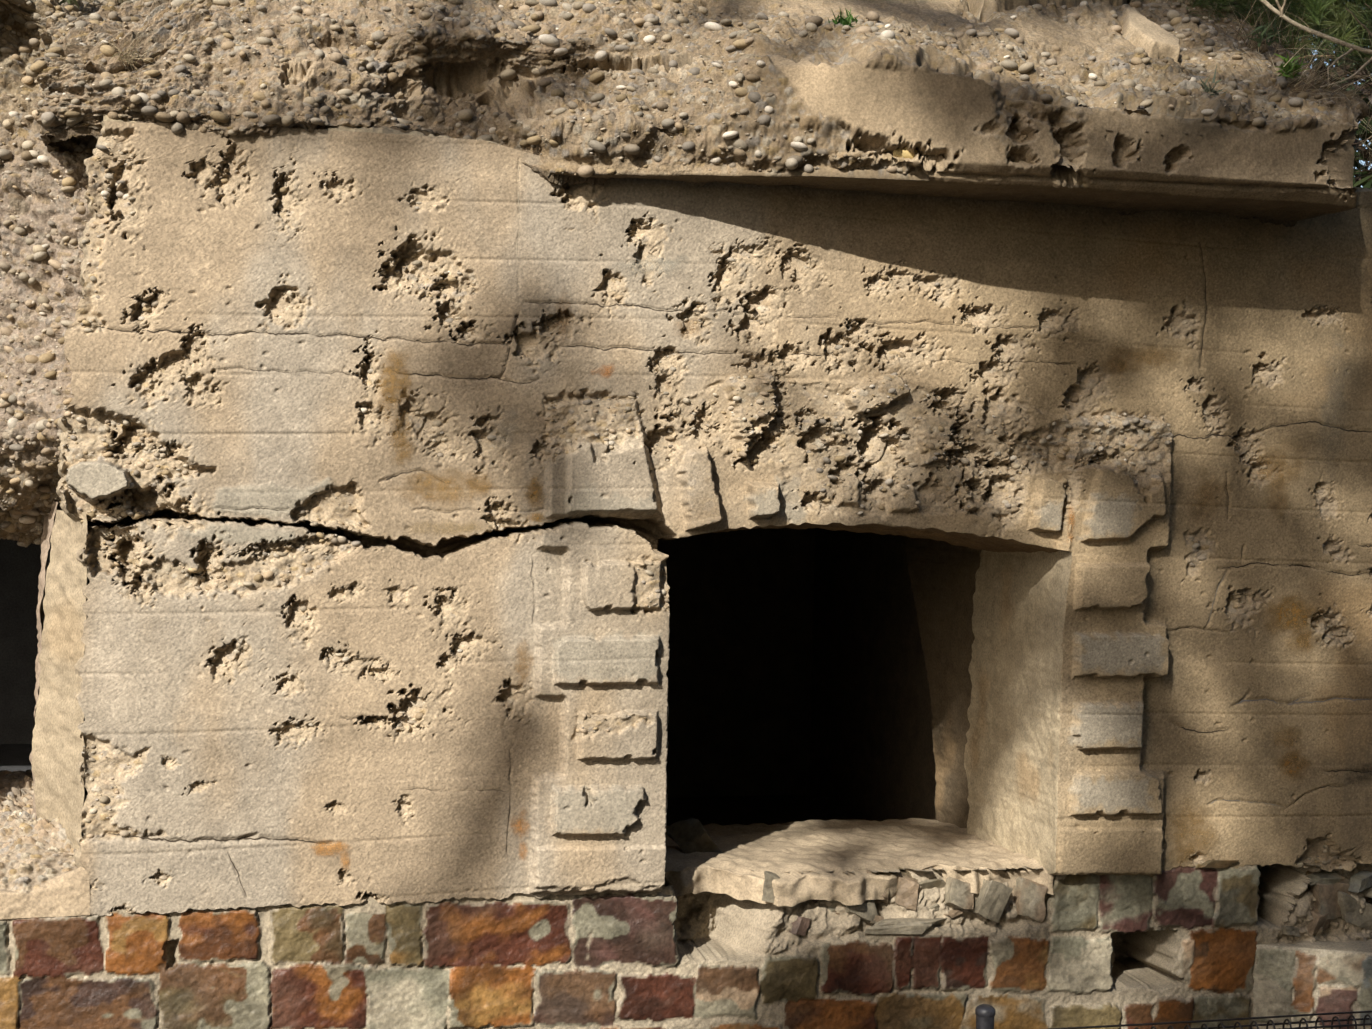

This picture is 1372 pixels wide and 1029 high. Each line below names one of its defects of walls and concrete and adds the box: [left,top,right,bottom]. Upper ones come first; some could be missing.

spalling [843,108,1196,193]
spalling [373,184,588,375]
spalling [592,217,670,319]
spalling [59,127,501,743]
spalling [352,234,1174,545]
crack [1173,421,1372,439]
crack [88,470,678,617]
crack [1171,545,1372,632]
spalling [268,717,328,751]
spalling [494,677,542,722]
crack [1169,697,1371,733]
crack [1209,770,1370,809]